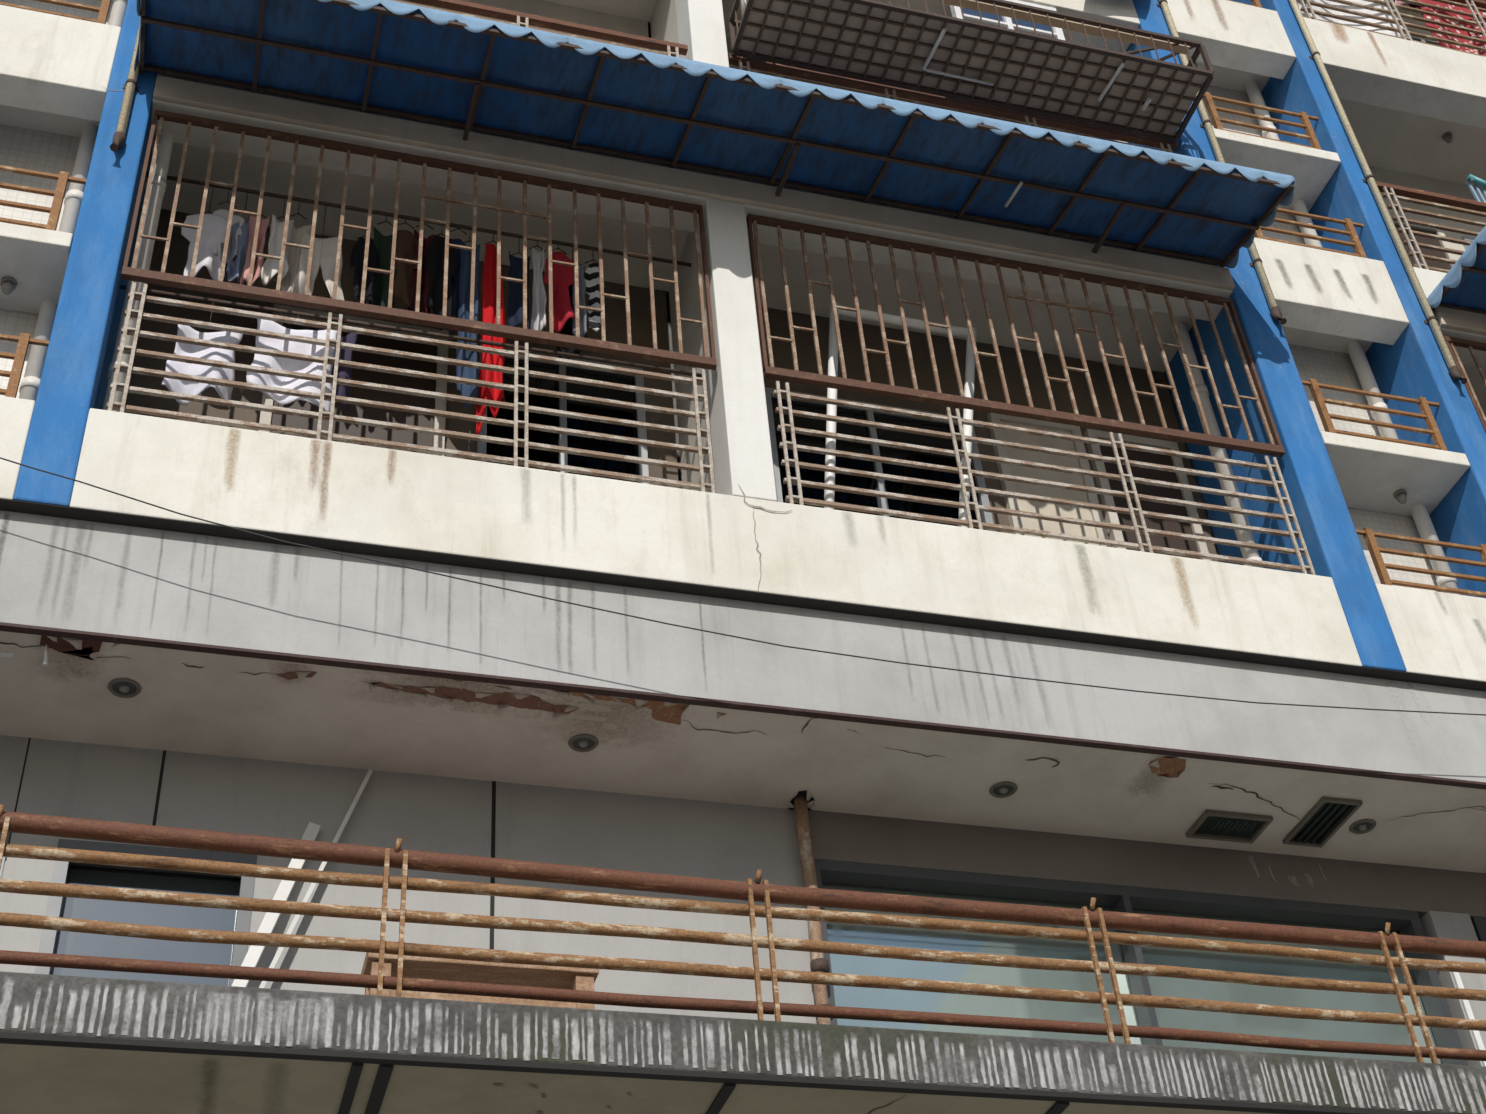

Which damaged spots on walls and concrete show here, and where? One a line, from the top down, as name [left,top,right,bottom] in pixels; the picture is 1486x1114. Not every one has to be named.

crack [738,484,792,588]
crack [0,642,130,659]
peeling [40,635,119,667]
peeling [275,672,317,680]
peeling [362,679,689,725]
crack [1208,783,1300,820]
crack [1384,806,1486,822]